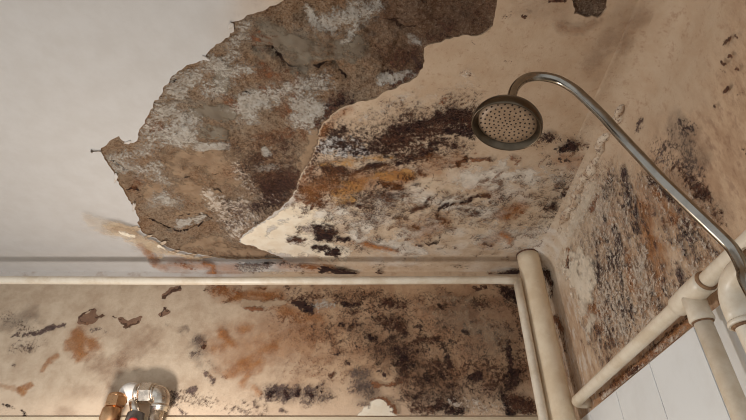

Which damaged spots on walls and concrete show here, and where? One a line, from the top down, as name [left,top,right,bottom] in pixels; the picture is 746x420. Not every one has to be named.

spalling [548,0,606,17]
spalling [101,0,497,260]
water stain [220,65,727,366]
water stain [9,321,67,353]
rust [66,329,94,361]
peeling [77,308,142,329]
peeling [158,286,182,317]
water stain [170,366,335,416]
rust [203,285,362,355]
water stain [279,284,537,416]
water stain [553,315,576,387]
water stain [599,315,687,402]